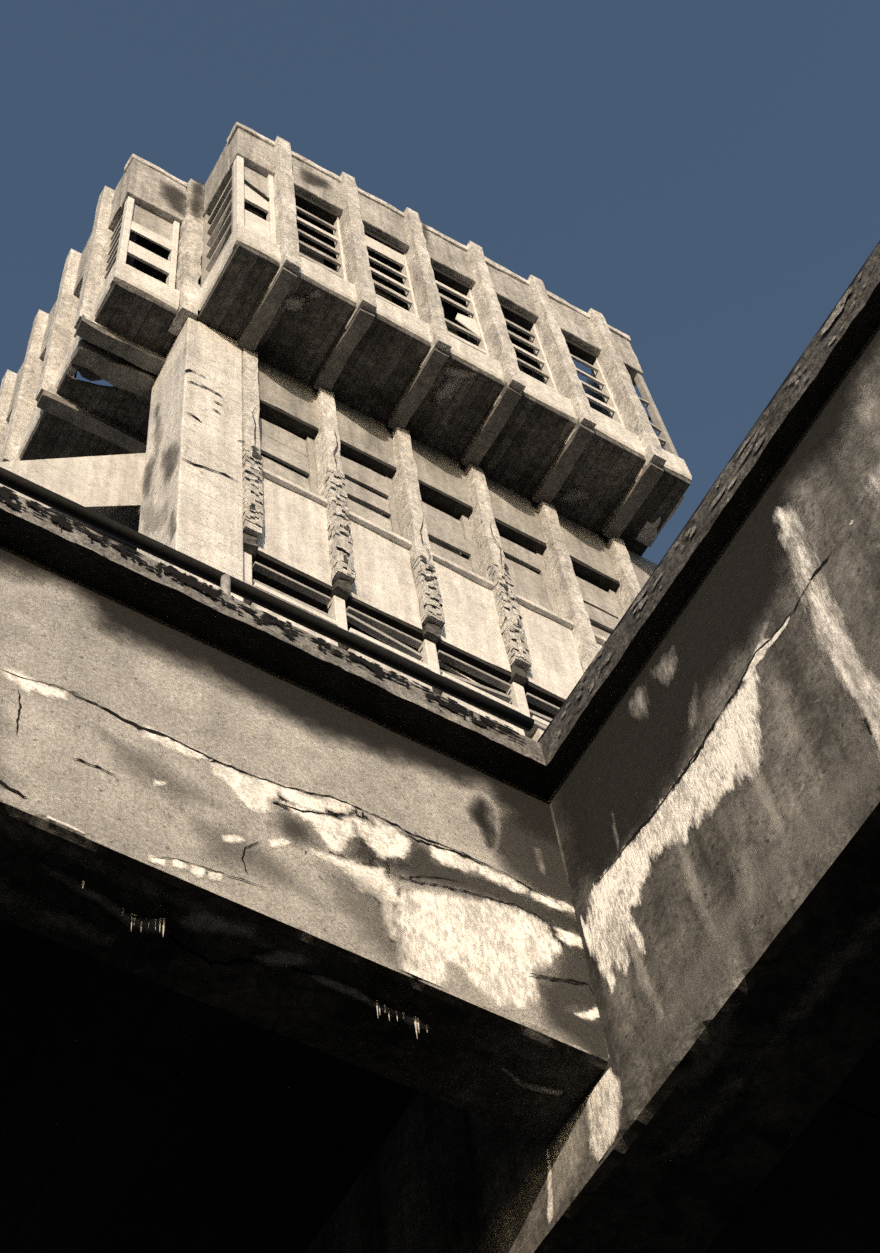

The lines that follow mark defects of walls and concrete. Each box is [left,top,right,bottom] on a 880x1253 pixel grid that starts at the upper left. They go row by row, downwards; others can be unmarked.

crack [0,668,576,925]
leakage [0,323,880,1222]